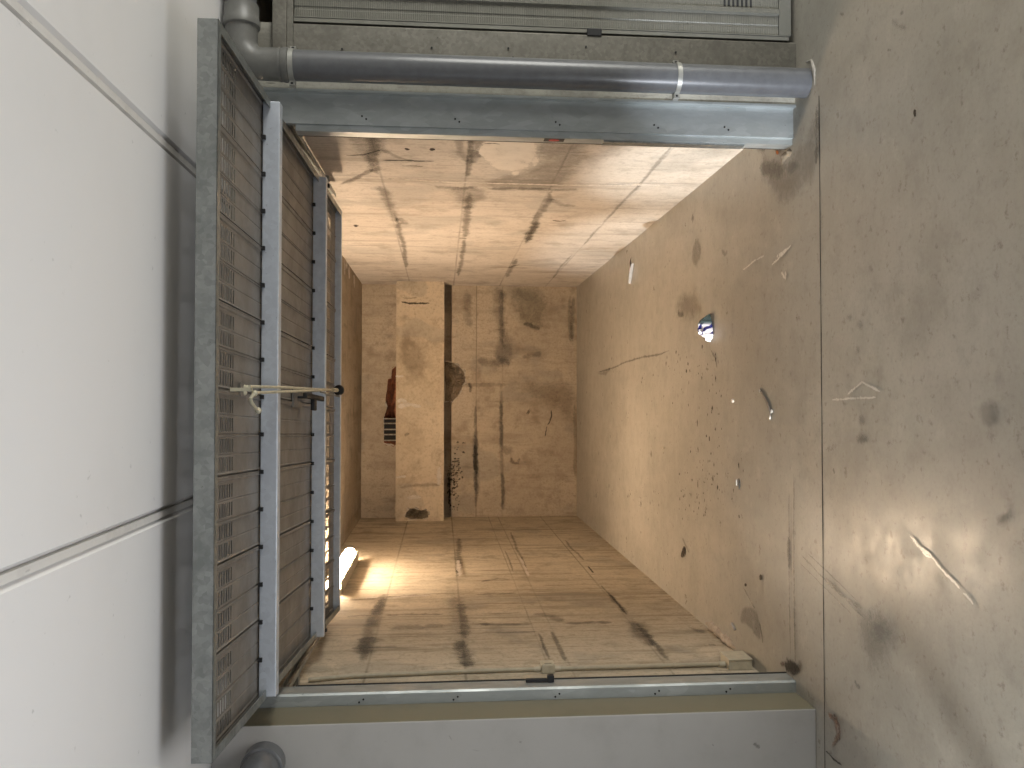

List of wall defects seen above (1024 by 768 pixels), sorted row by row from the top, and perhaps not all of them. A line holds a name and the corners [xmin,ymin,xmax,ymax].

water stain [447,441,478,510]